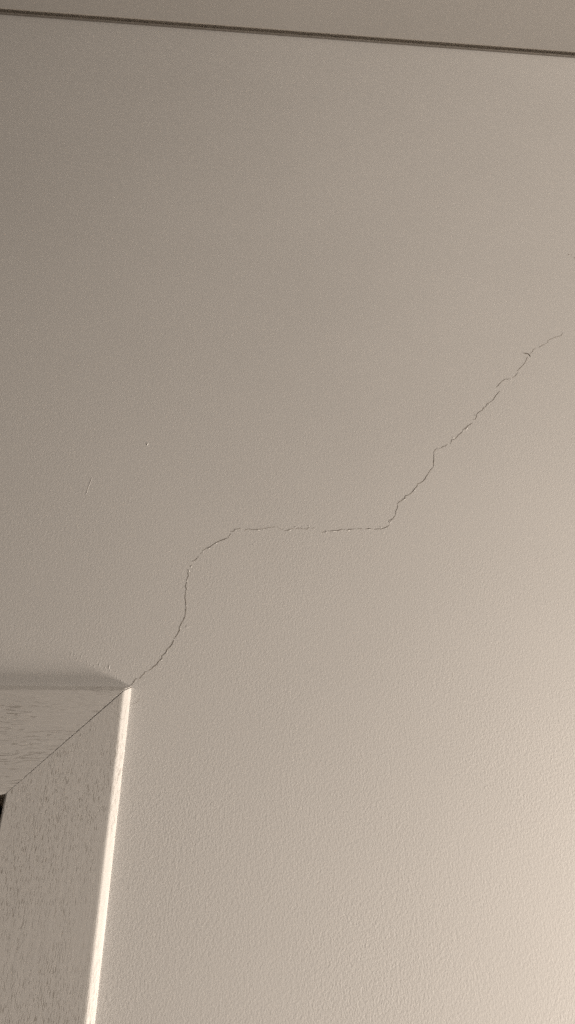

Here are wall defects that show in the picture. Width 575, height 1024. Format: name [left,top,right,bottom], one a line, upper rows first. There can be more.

crack [130,333,563,704]